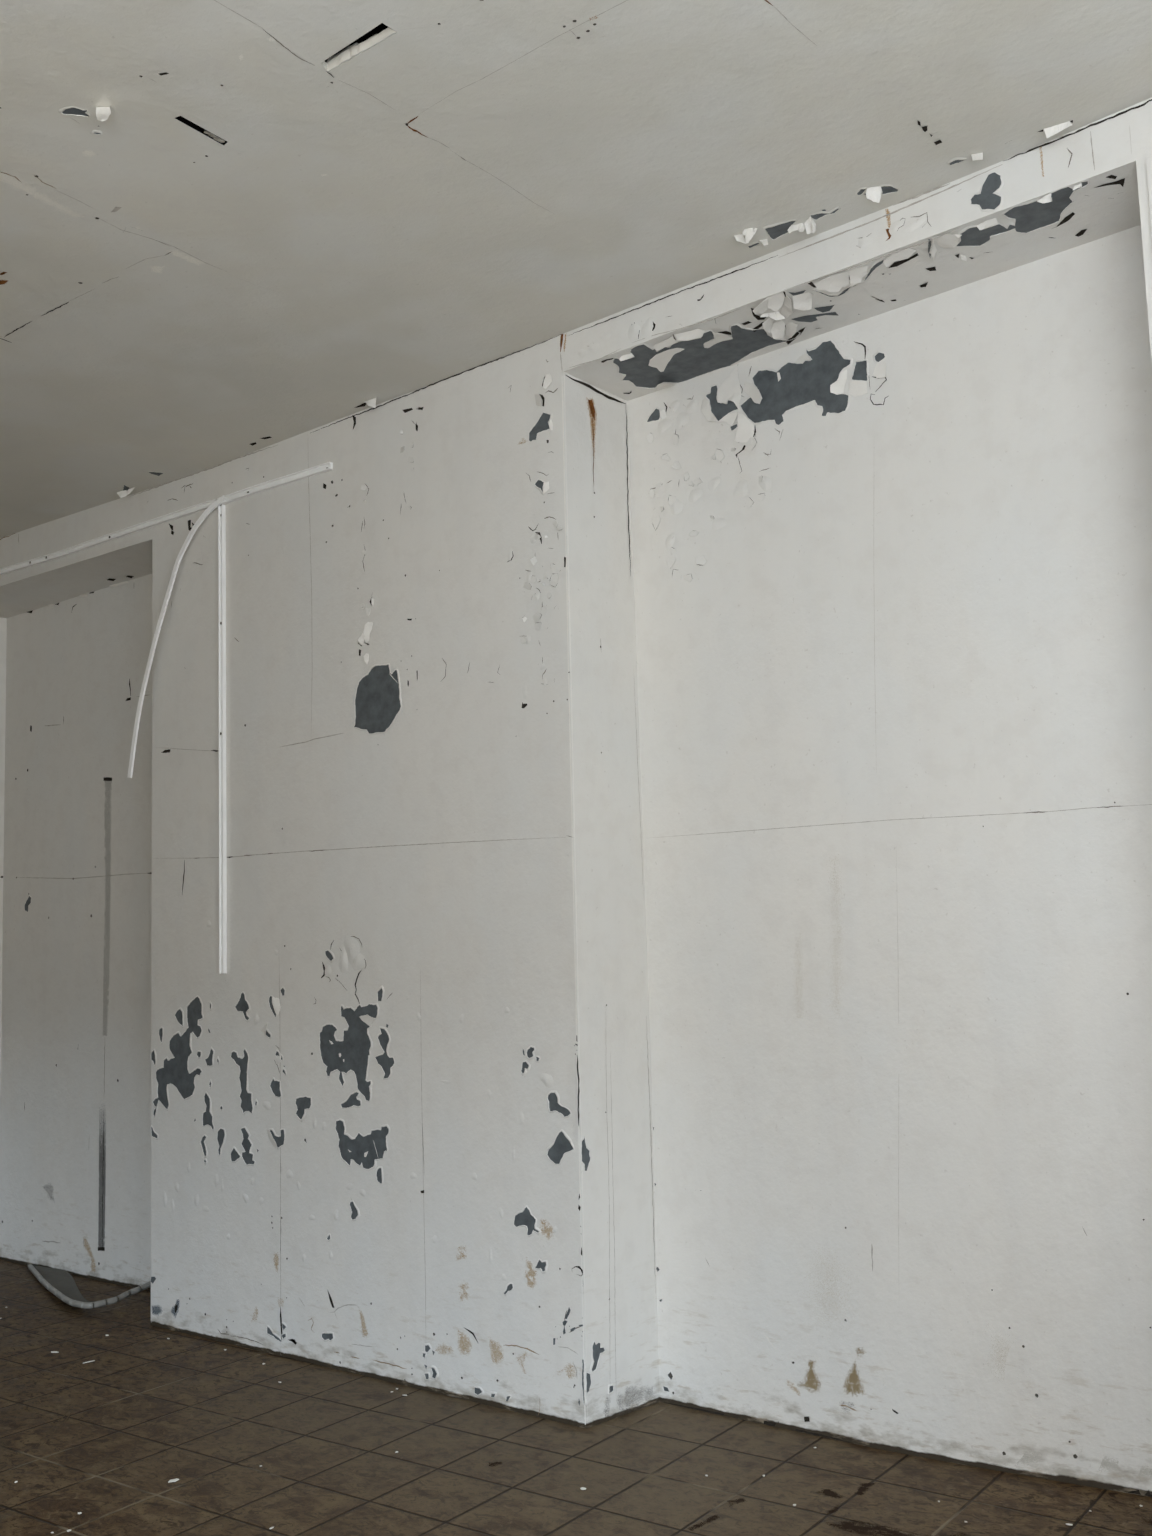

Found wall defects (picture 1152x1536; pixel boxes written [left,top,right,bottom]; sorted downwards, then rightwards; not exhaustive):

peeling [1038,120,1073,138]
peeling [601,153,1125,458]
peeling [150,968,312,1166]
peeling [311,971,395,1184]
peeling [520,1045,541,1076]
peeling [546,1090,592,1172]
peeling [514,1205,541,1237]